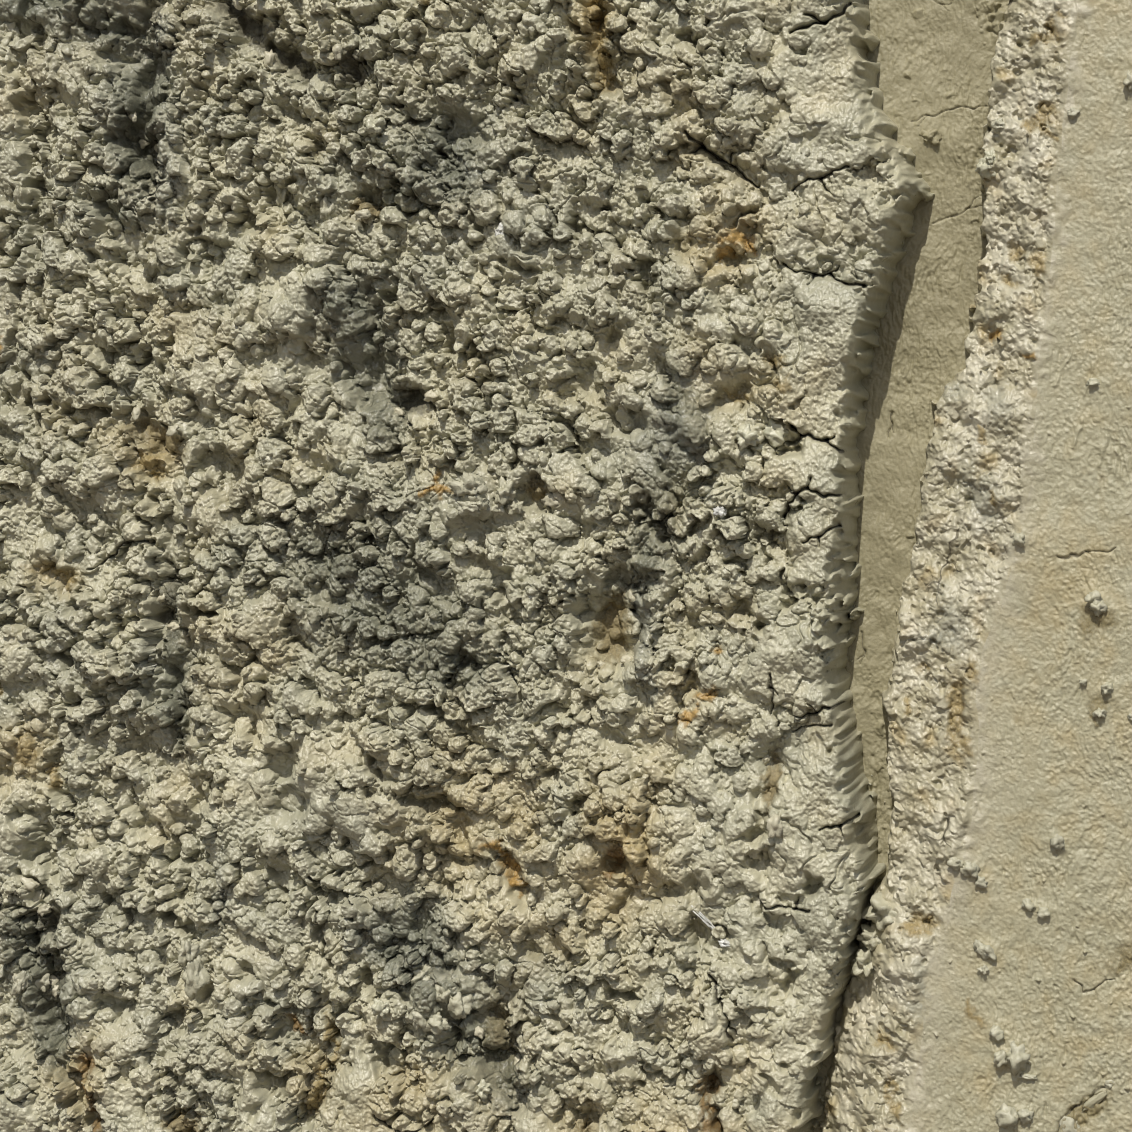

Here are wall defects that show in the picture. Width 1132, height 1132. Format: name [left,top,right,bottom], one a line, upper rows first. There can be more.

crack [791,2,851,33]
rust [591,0,612,82]
crack [793,165,849,191]
crack [782,262,866,287]
crack [788,423,844,453]
crack [783,478,842,516]
spalling [820,0,1079,1132]
crack [769,674,845,731]
rust [483,841,528,897]
rust [603,847,624,879]
crack [759,899,810,912]
crack [708,974,737,1038]